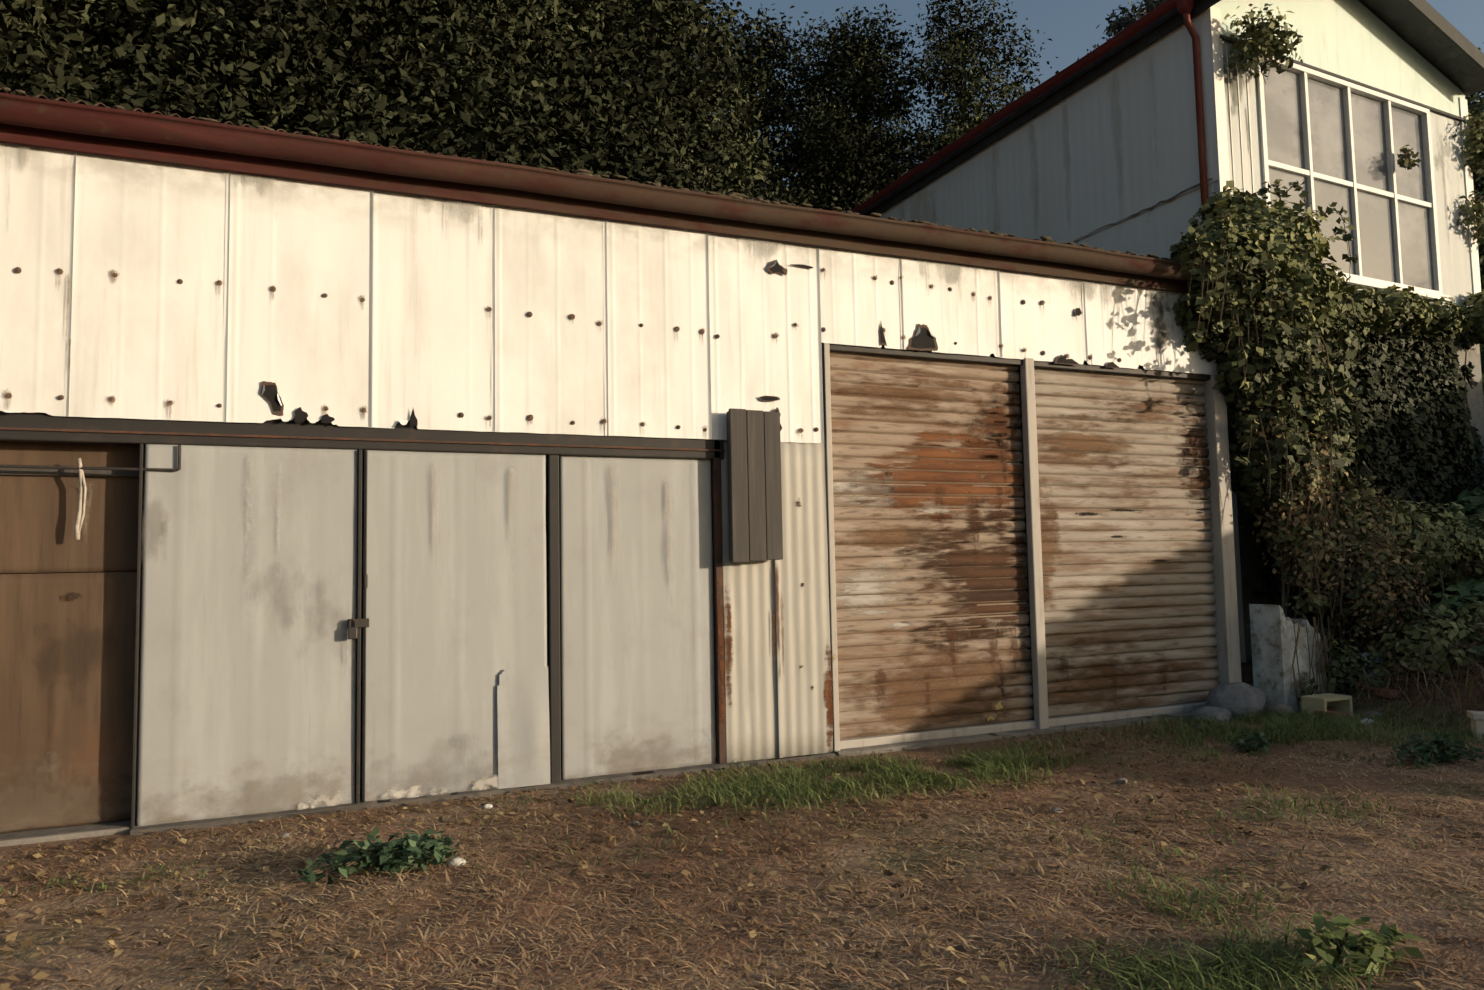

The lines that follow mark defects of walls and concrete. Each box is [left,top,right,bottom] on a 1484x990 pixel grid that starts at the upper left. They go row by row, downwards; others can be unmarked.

rust [902,324,938,351]
peeling [277,394,337,425]
peeling [399,409,418,426]
rust [1037,390,1211,518]
rust [812,370,1061,746]
rust [718,591,733,723]
rust [773,568,803,668]
rust [1047,637,1197,712]